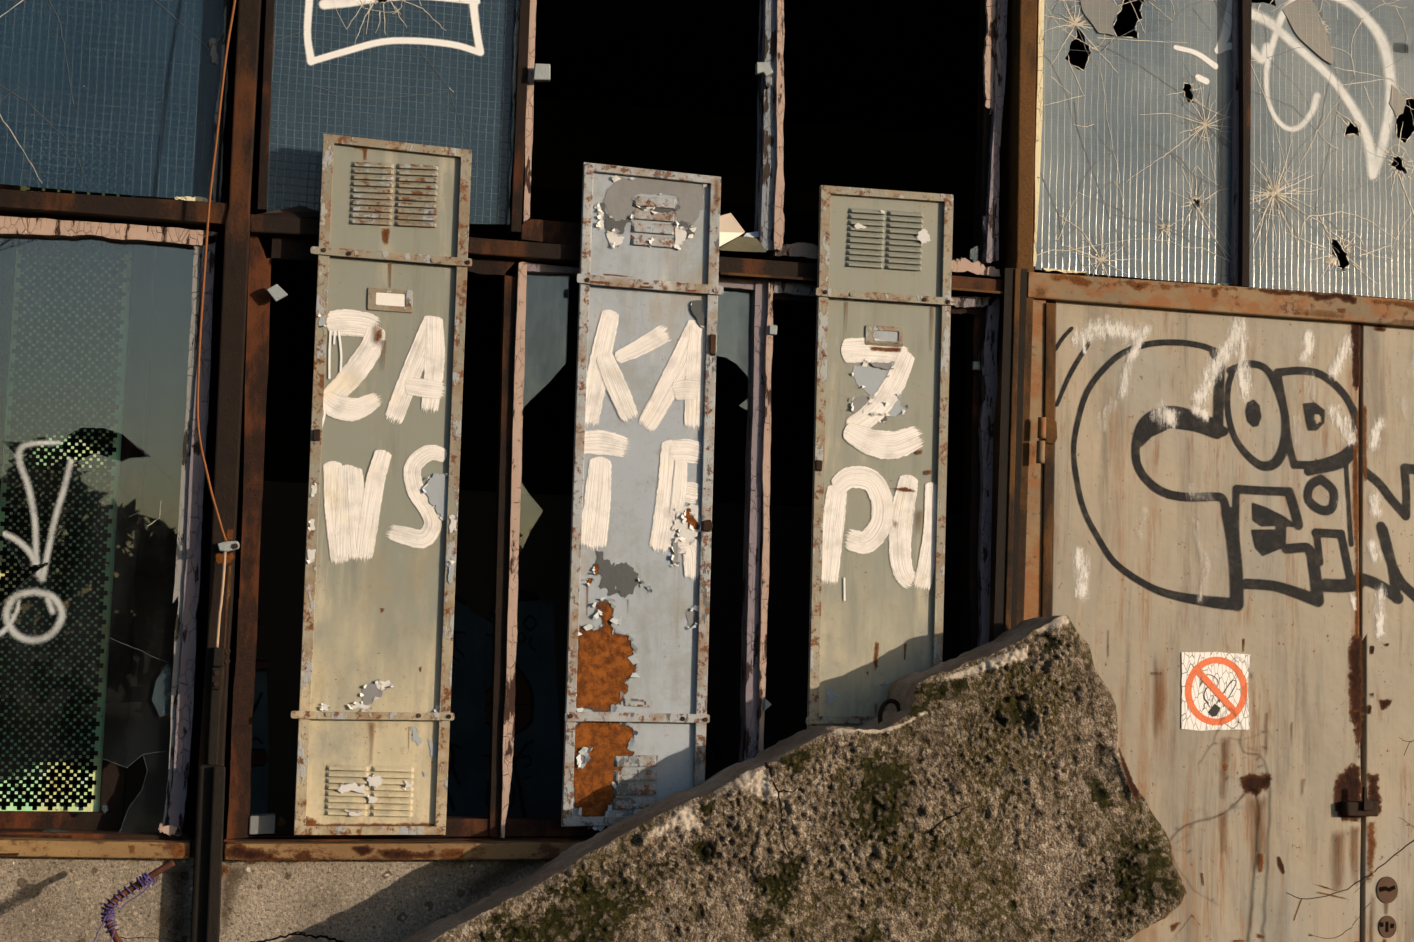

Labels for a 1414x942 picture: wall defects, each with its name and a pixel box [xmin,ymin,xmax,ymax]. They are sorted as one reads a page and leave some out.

rust [1039,274,1414,390]
peeling [851,359,908,423]
peeling [587,549,653,599]
peeling [348,679,394,712]
rust [573,585,641,831]
rust [1294,406,1392,920]
rust [1223,741,1285,874]
crack [250,931,345,942]